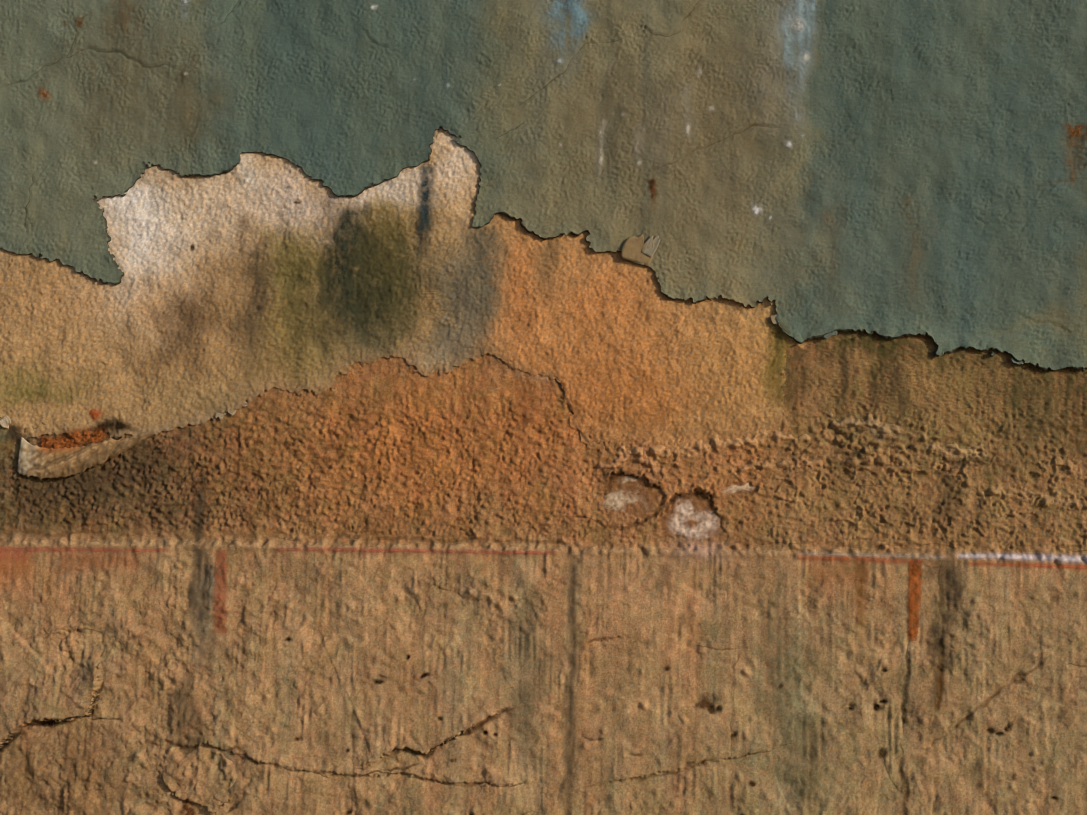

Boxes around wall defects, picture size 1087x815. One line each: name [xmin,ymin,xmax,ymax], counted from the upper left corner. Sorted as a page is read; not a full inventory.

peeling [0,126,495,480]
damp [319,210,406,326]
damp [418,167,432,258]
flaking render [0,213,1087,815]
crack [0,685,106,751]
crack [371,710,507,773]
crack [885,647,910,797]
crack [937,640,945,699]